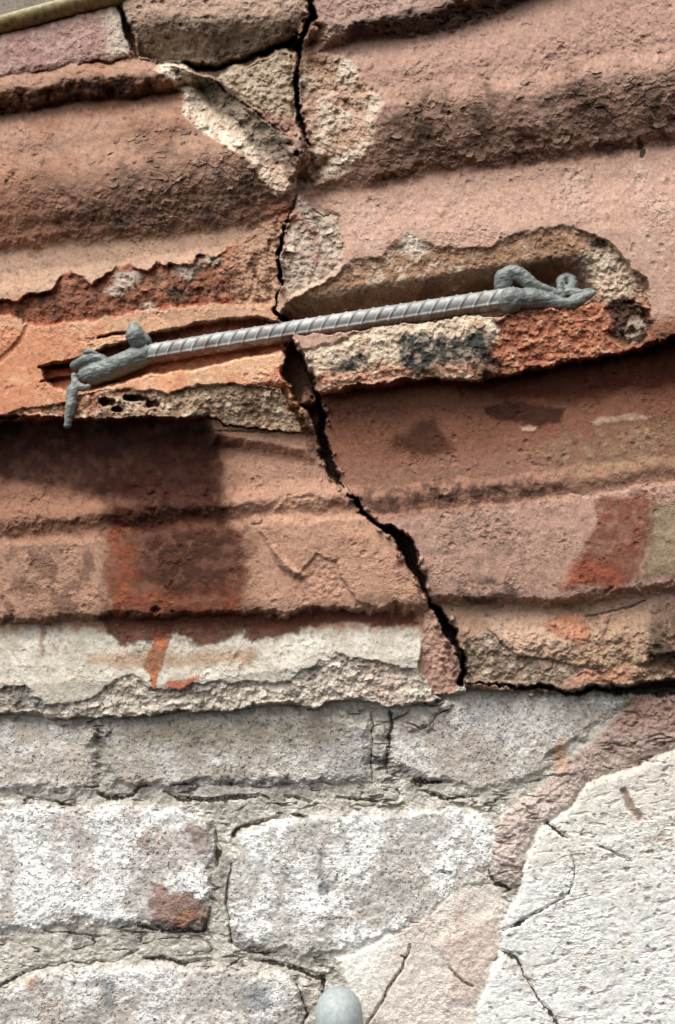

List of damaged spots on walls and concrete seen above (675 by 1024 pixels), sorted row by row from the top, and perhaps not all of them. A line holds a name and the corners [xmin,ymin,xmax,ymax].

spalling [0,23,654,395]
water stain [0,424,220,528]
spalling [0,383,304,435]
crack [272,208,675,802]
corrosion [106,506,248,691]
spalling [0,647,443,721]
crack [488,853,513,890]
crack [501,822,575,1024]